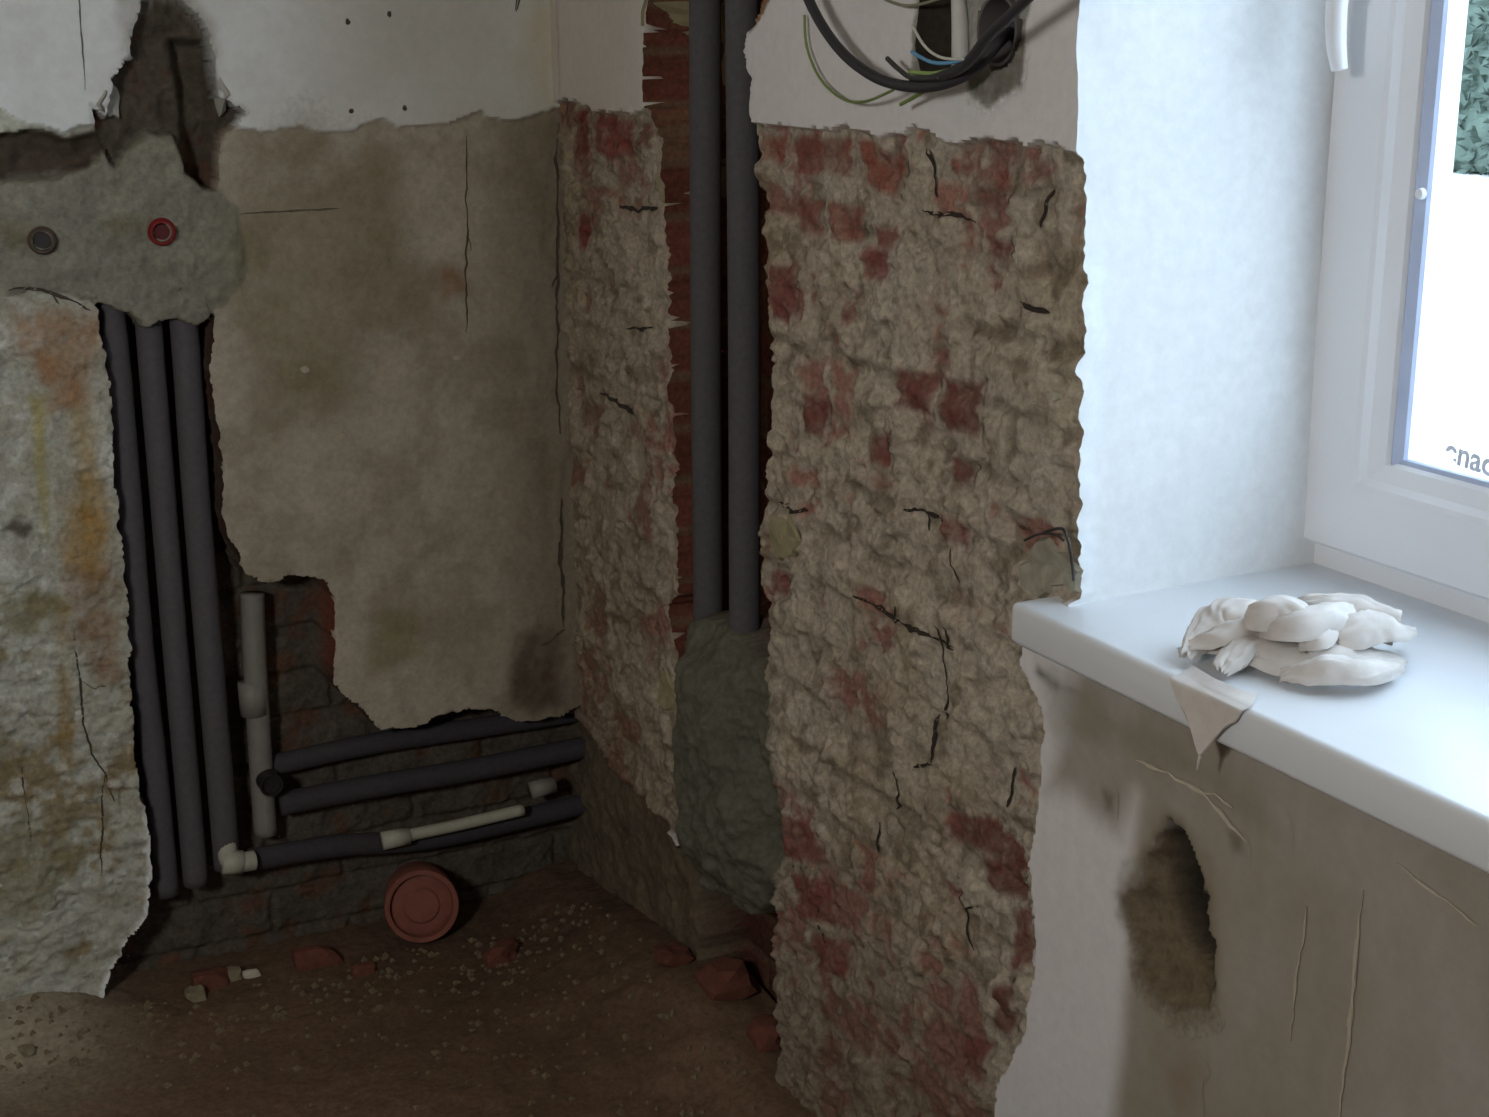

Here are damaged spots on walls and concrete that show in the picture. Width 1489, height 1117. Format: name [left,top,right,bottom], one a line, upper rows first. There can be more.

flaking render [0,85,120,136]
flaking render [214,76,231,179]
spalling [915,0,951,71]
corrosion [0,297,131,778]
flaking render [0,335,151,1002]
crack [73,628,115,876]
flaking render [209,97,690,844]
crack [853,595,953,853]
flaking render [753,121,1089,1117]
crack [903,507,960,583]
flaking render [227,966,261,982]
spalling [1120,818,1217,989]